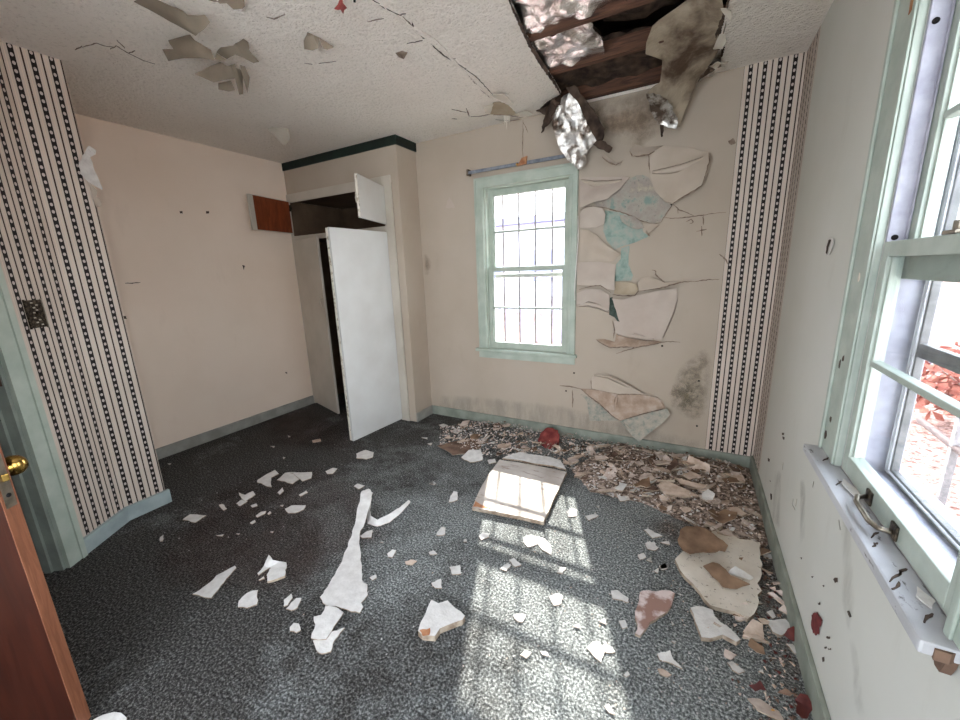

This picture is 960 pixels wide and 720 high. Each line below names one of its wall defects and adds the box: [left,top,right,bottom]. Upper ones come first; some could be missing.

peeling [134,0,259,95]
peeling [304,32,334,51]
crack [367,0,493,100]
peeling [576,144,719,354]
peeling [560,373,670,441]